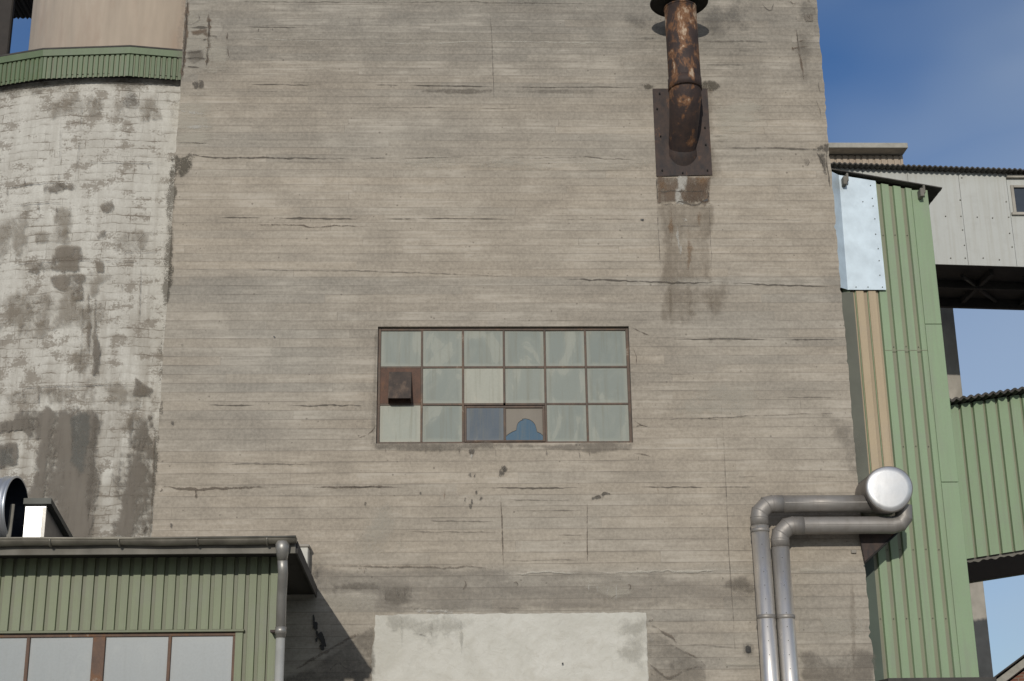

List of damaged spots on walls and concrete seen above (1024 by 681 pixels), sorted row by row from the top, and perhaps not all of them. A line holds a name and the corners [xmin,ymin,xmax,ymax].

crack [416,82,486,90]
crack [393,214,493,222]
crack [225,217,351,228]
crack [143,428,254,533]
crack [317,482,389,490]